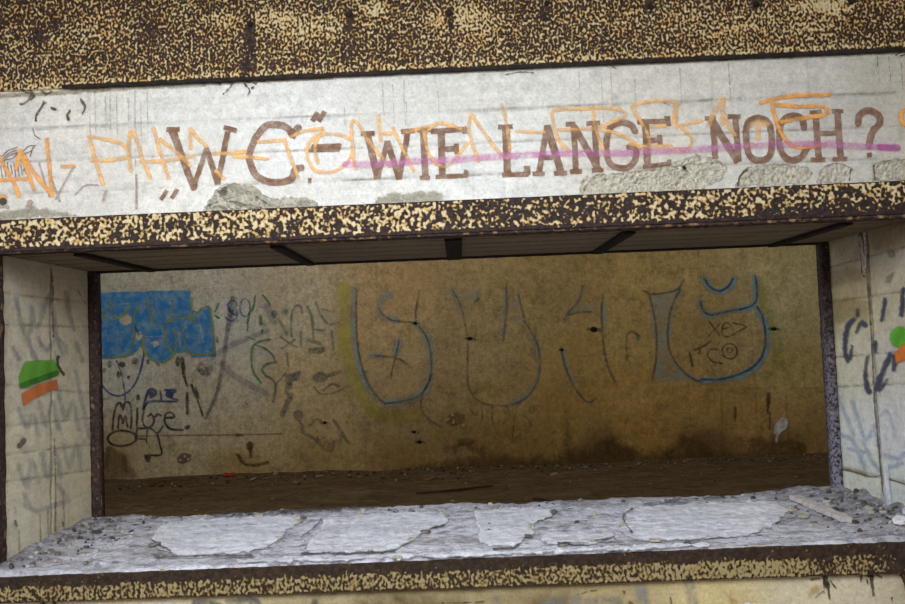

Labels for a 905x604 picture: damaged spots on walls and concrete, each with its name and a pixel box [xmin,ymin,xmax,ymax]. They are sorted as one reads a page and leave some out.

spalling [578,154,727,195]
spalling [735,163,853,186]
spalling [872,157,905,181]
spalling [376,192,440,204]
crack [211,506,374,537]
crack [557,495,724,544]
crack [151,539,252,557]